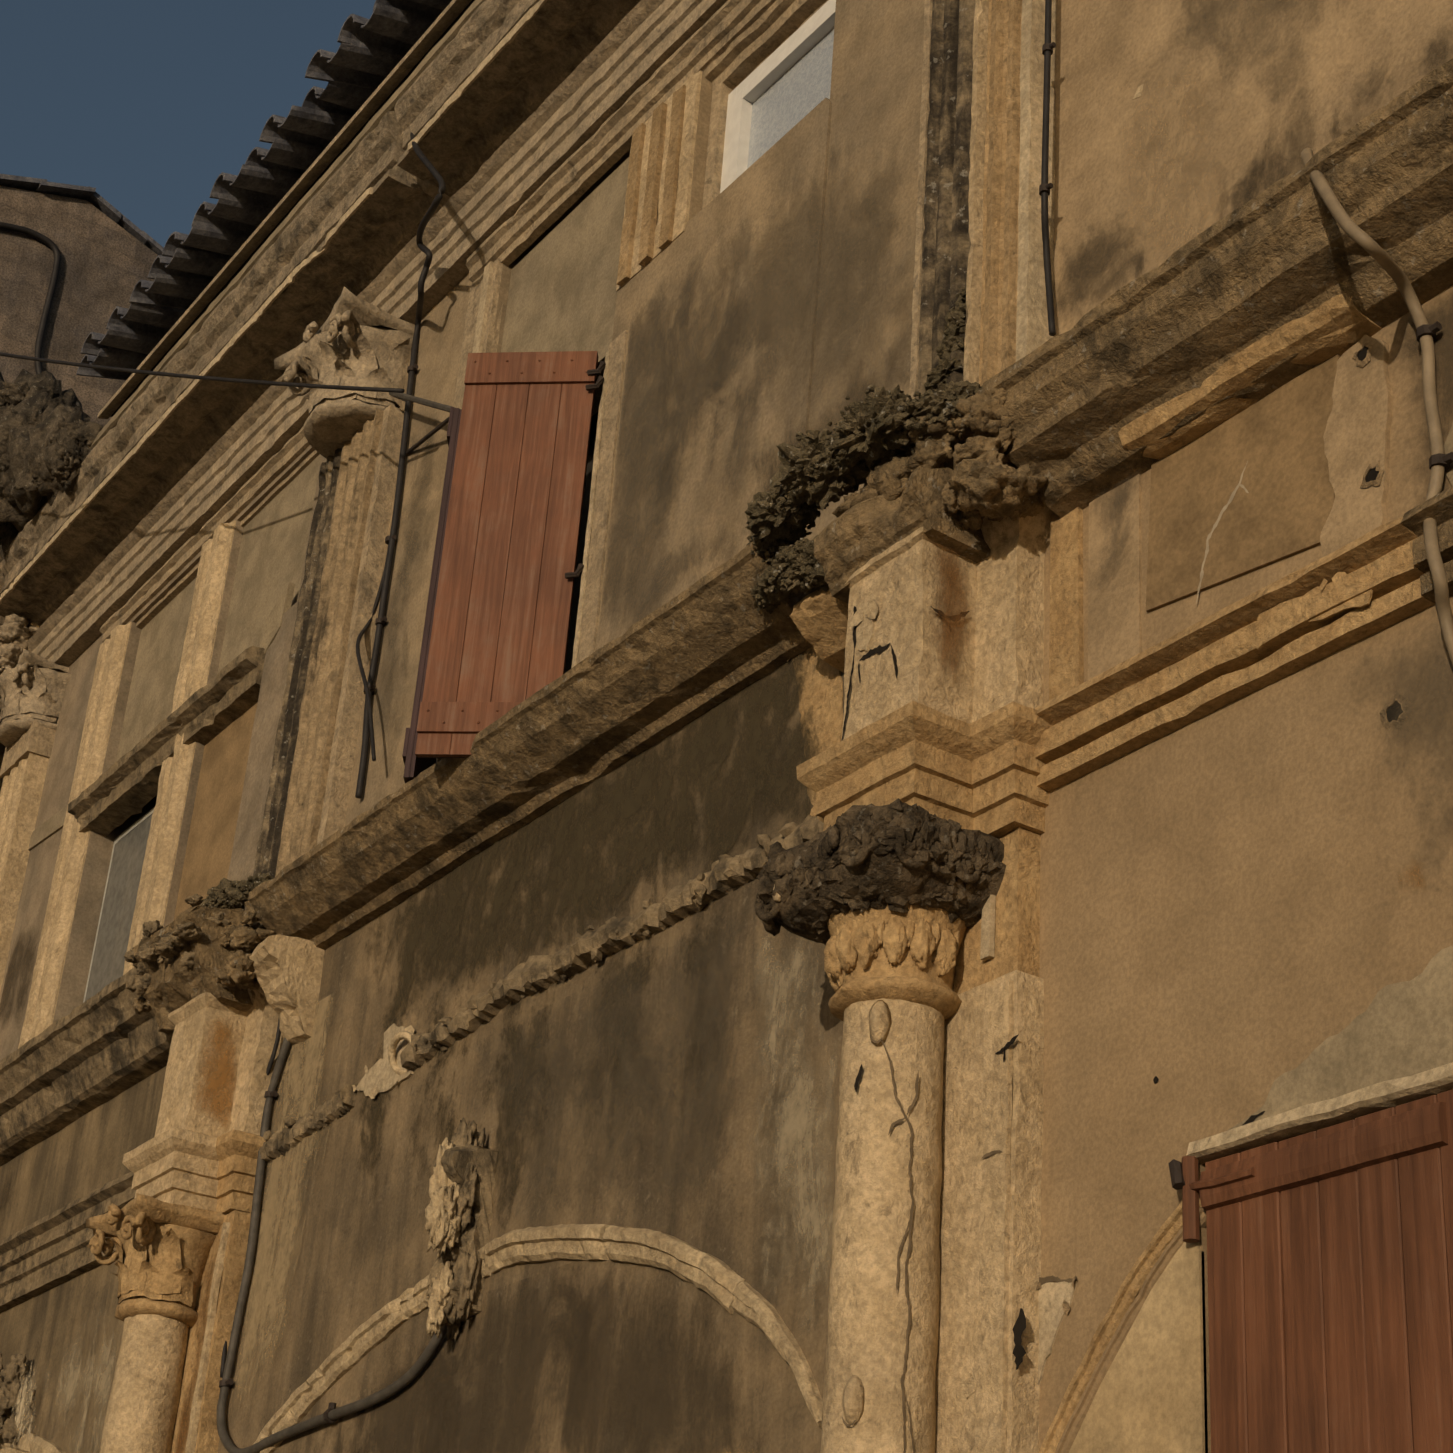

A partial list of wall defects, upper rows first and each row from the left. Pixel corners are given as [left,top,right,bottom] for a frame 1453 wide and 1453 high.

leakage [1129,75,1206,238]
leakage [1061,237,1143,305]
leakage [603,279,735,623]
crack [1196,461,1249,603]
crack [842,606,898,740]
leakage [376,651,815,1030]
leakage [236,995,332,1394]
leakage [360,1091,388,1168]
leakage [489,1002,551,1209]
leakage [757,941,835,1286]
crack [854,1040,919,1453]
leakage [337,1281,731,1453]